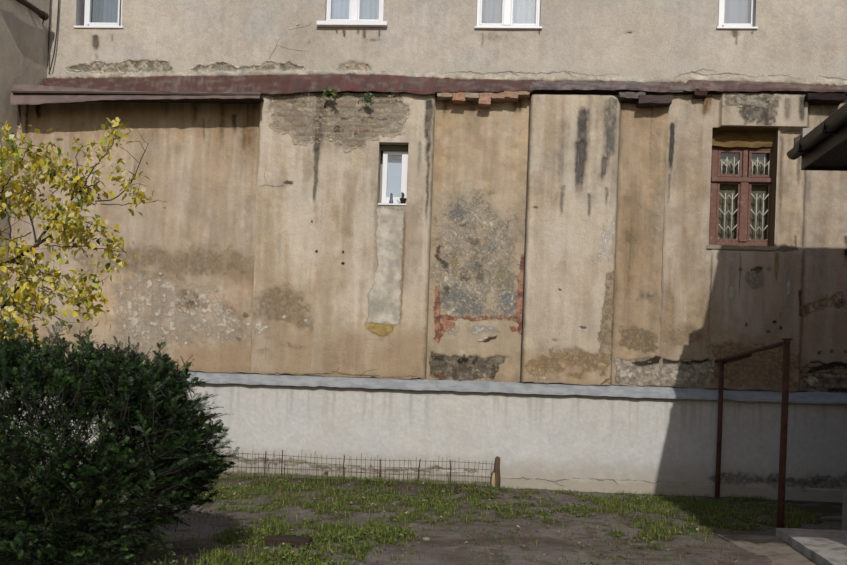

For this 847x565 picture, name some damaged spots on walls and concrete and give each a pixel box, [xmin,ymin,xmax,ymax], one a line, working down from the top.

flaking render [66,57,173,74]
flaking render [189,59,305,72]
flaking render [266,92,411,153]
leakage [575,109,589,184]
leakage [601,97,617,178]
flaking render [722,93,774,111]
peeling [432,196,525,343]
flaking render [114,272,268,345]
flaking render [598,272,714,388]
flaking render [429,352,506,380]
flaking render [800,361,847,393]